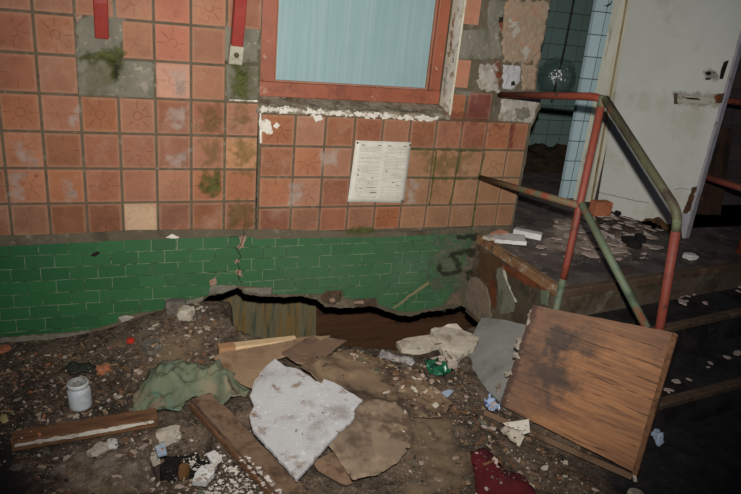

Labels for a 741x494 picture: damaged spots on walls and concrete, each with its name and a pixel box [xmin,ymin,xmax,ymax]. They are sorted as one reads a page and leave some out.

spalling [224,23,440,143]
spalling [443,0,550,123]
crack [209,130,258,286]
crack [393,282,429,309]
water stain [437,234,478,280]